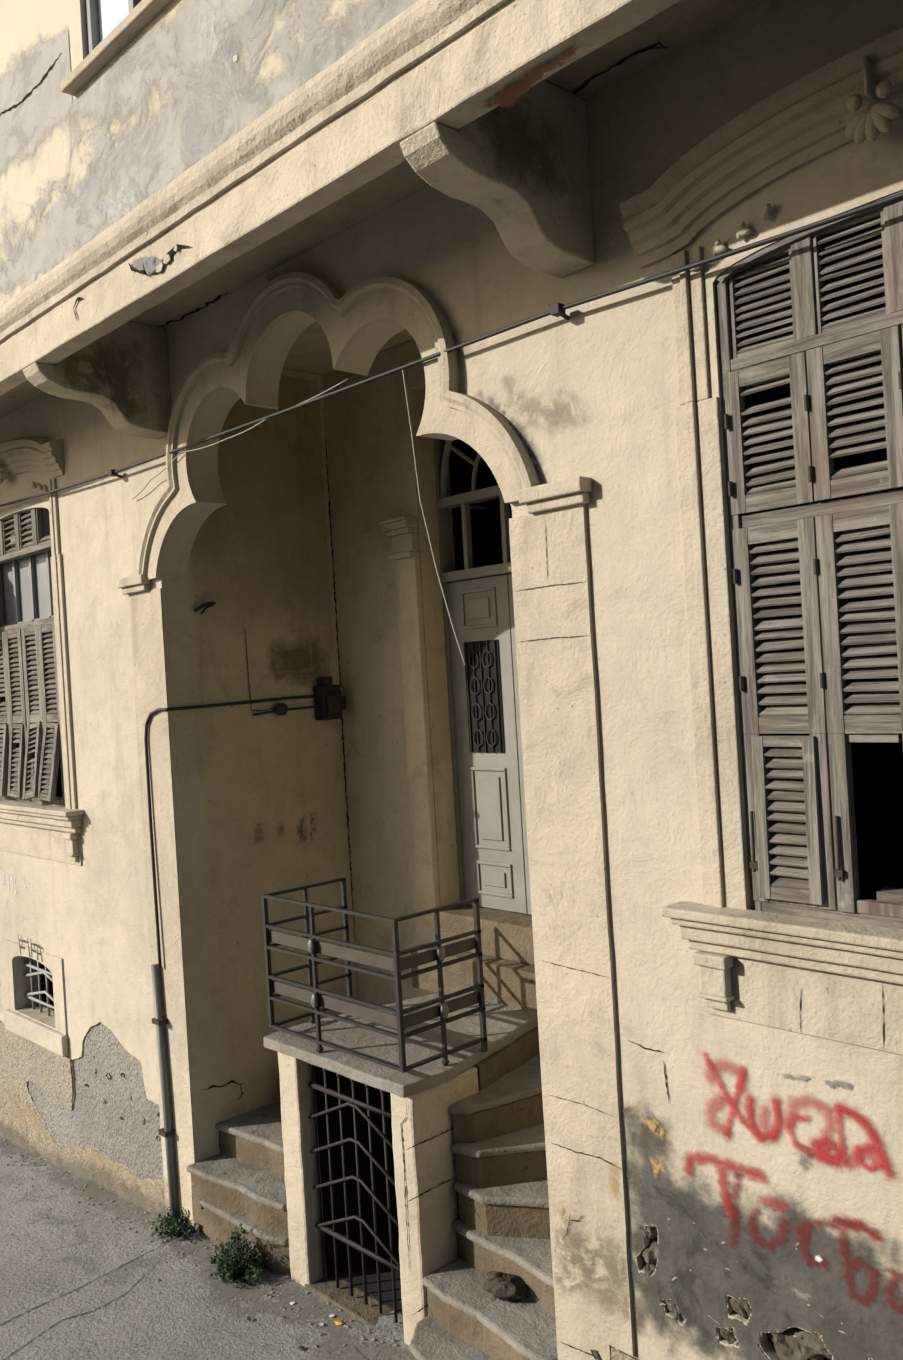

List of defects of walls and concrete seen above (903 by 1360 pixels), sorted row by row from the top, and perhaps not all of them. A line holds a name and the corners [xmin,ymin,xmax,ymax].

crack [0,52,62,115]
crack [573,19,669,95]
peeling [0,0,418,293]
flaking render [28,1022,164,1185]
flaking render [641,1226,658,1276]
damp [557,1107,903,1360]
flaking render [719,1297,751,1345]
flaking render [758,1327,832,1360]